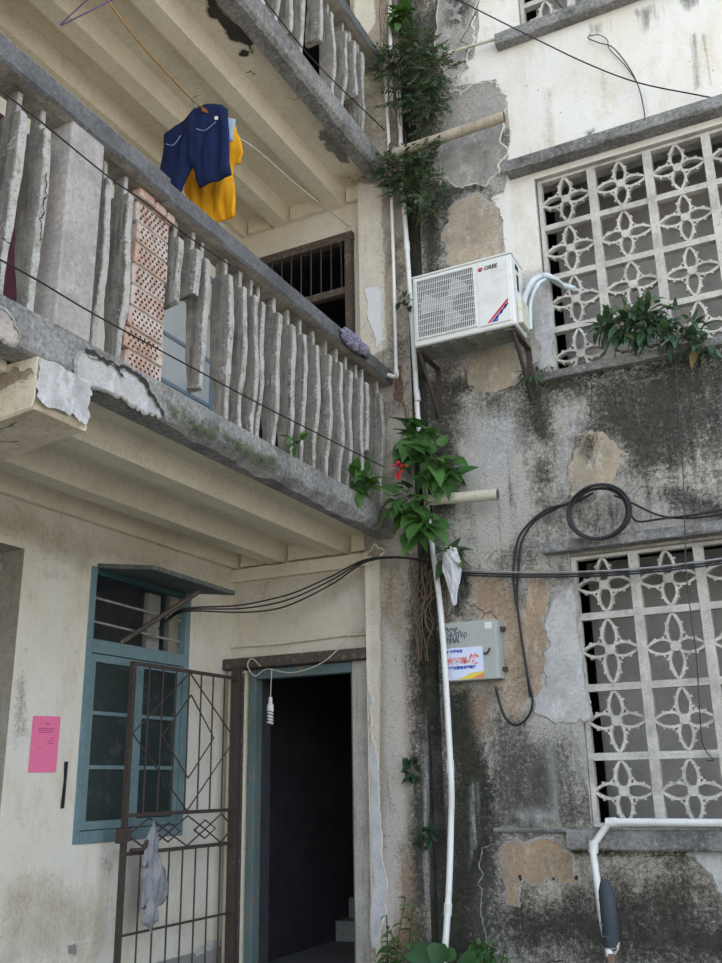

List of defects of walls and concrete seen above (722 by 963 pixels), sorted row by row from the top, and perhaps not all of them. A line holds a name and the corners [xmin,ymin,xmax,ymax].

spalling [204,0,254,57]
flaking render [434,0,509,267]
spalling [0,306,22,347]
spalling [0,349,163,424]
damp [468,375,598,476]
flaking render [566,430,622,497]
damp [646,484,722,520]
flaking render [526,567,593,725]
spalling [499,835,581,908]